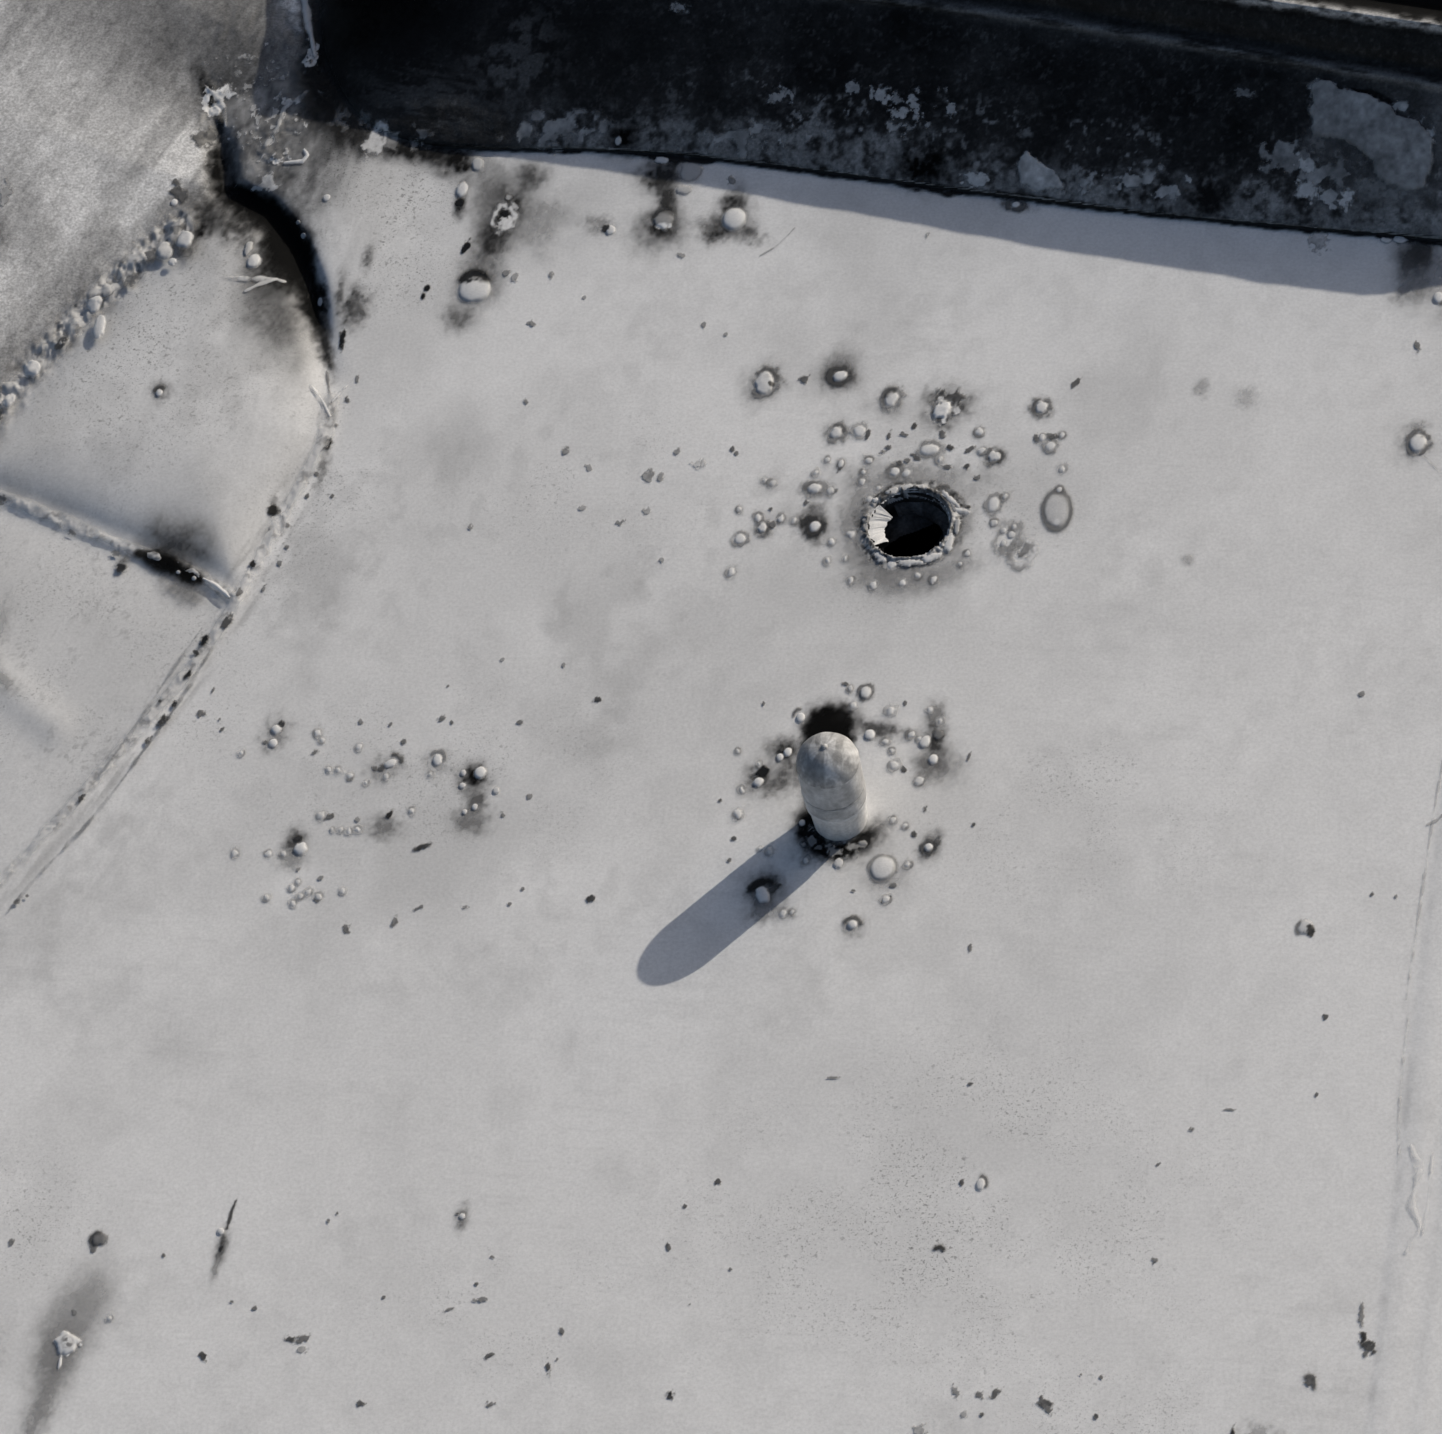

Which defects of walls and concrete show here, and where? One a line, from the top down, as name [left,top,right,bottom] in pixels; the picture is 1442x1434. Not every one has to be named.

peeling [1293,80,1434,213]